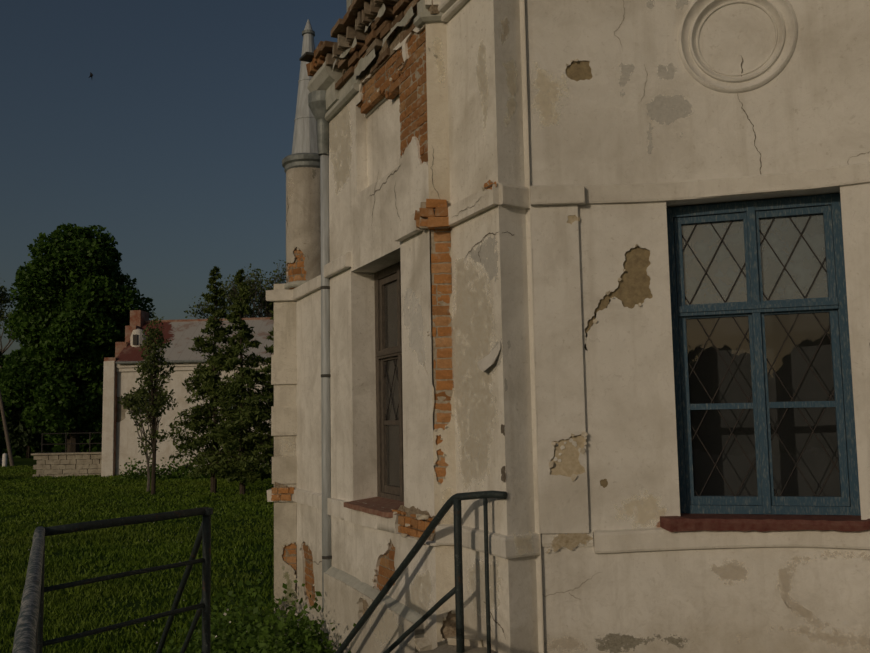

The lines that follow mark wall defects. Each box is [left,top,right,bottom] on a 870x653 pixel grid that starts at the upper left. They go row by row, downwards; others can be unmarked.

flaking render [306,0,430,163]
flaking render [566,59,592,81]
crack [737,56,762,174]
flaking render [414,199,451,230]
crack [464,231,512,262]
flaking render [584,244,652,350]
flaking render [433,425,448,484]
flaking render [549,431,588,482]
flaking render [392,505,436,545]
flaking render [281,541,316,608]
flaking render [372,543,395,594]
water stain [550,633,687,653]